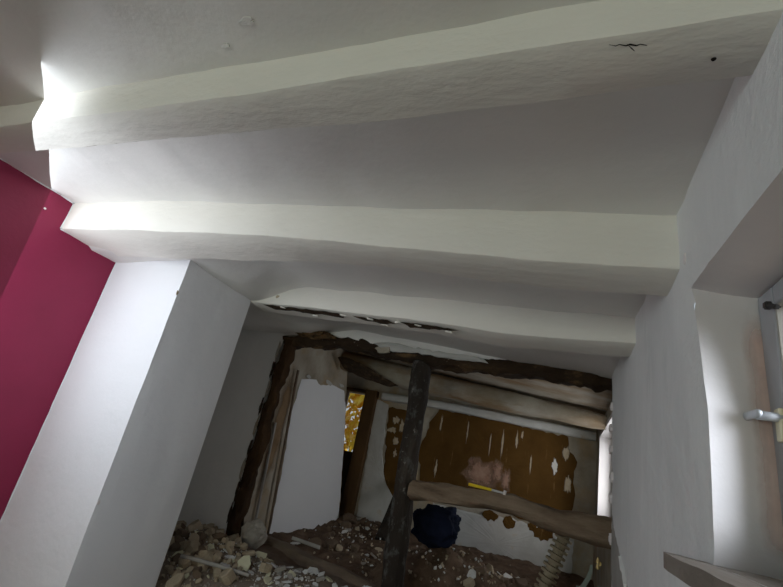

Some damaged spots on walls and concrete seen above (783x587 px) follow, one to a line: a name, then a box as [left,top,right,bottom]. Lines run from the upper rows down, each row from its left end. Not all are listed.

flaking render [297,331,336,340]
flaking render [263,295,459,334]
flaking render [338,357,398,387]
peeling [373,342,489,364]
peeling [269,375,346,534]
peeling [357,400,407,523]
peeling [419,409,577,511]
peeling [455,509,557,567]
flaking render [608,516,627,587]